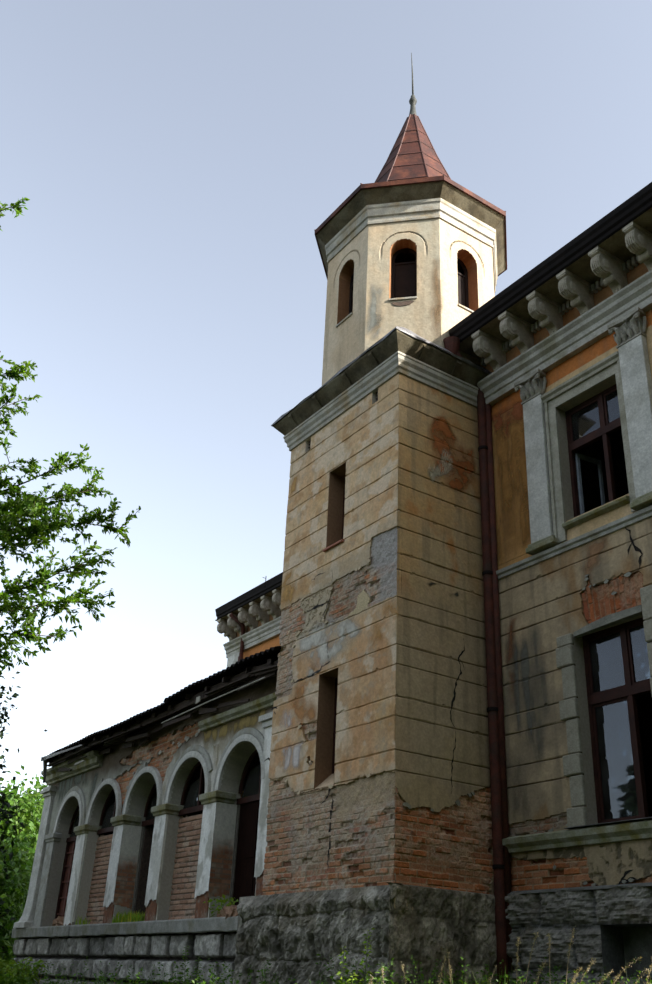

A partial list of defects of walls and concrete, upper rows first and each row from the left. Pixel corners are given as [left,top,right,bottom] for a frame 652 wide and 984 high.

flaking render [322,527,399,624]
flaking render [581,572,643,624]
crack [625,527,642,571]
flaking render [275,598,306,700]
crack [450,638,465,793]
flaking render [115,722,200,815]
flaking render [262,771,493,895]
flaking render [510,857,597,891]